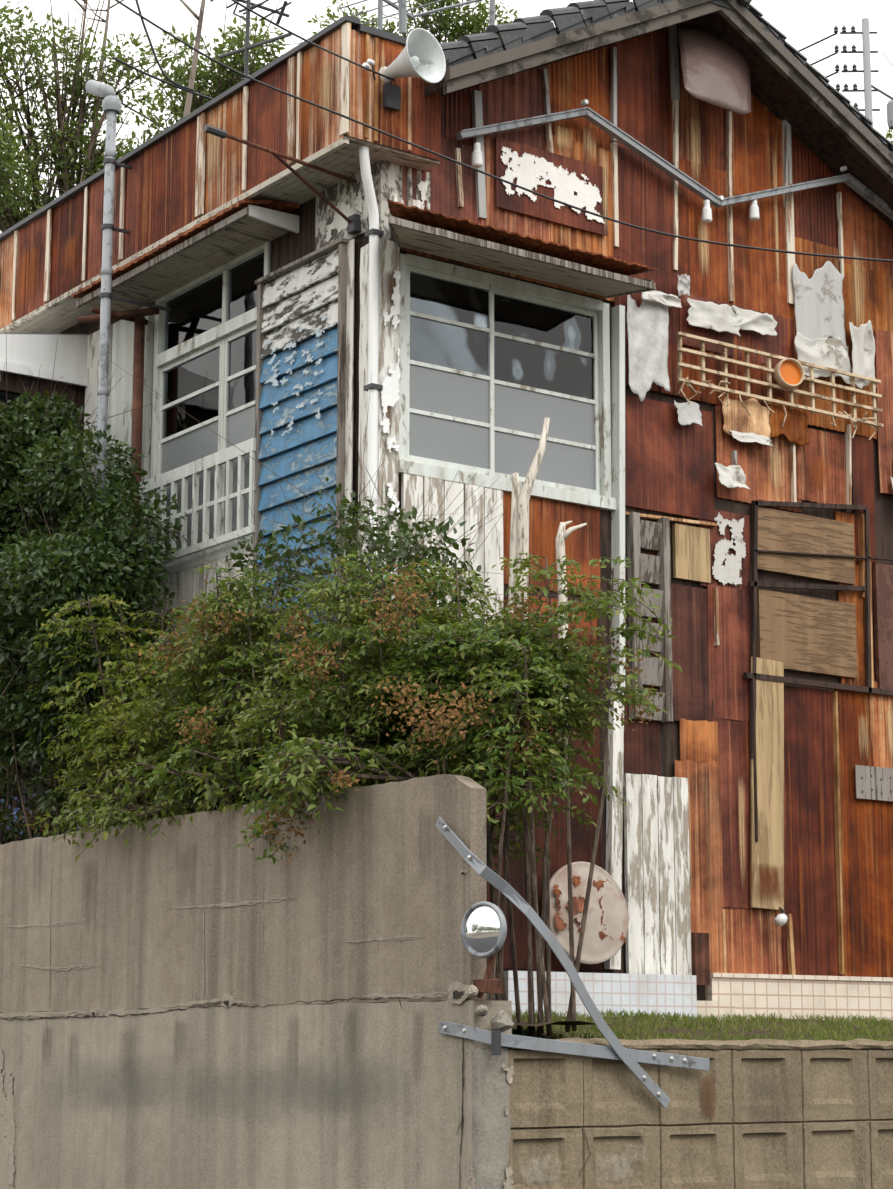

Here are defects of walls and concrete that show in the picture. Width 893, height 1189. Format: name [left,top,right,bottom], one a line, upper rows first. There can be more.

rust [299,63,332,137]
rust [691,117,715,172]
peeling [325,189,369,242]
peeling [392,180,430,209]
peeling [500,147,605,223]
rust [699,225,707,267]
rust [749,176,778,284]
rust [854,248,862,328]
peeling [264,315,327,436]
peeling [712,512,746,585]
rust [553,875,625,942]
crack [0,995,448,1044]